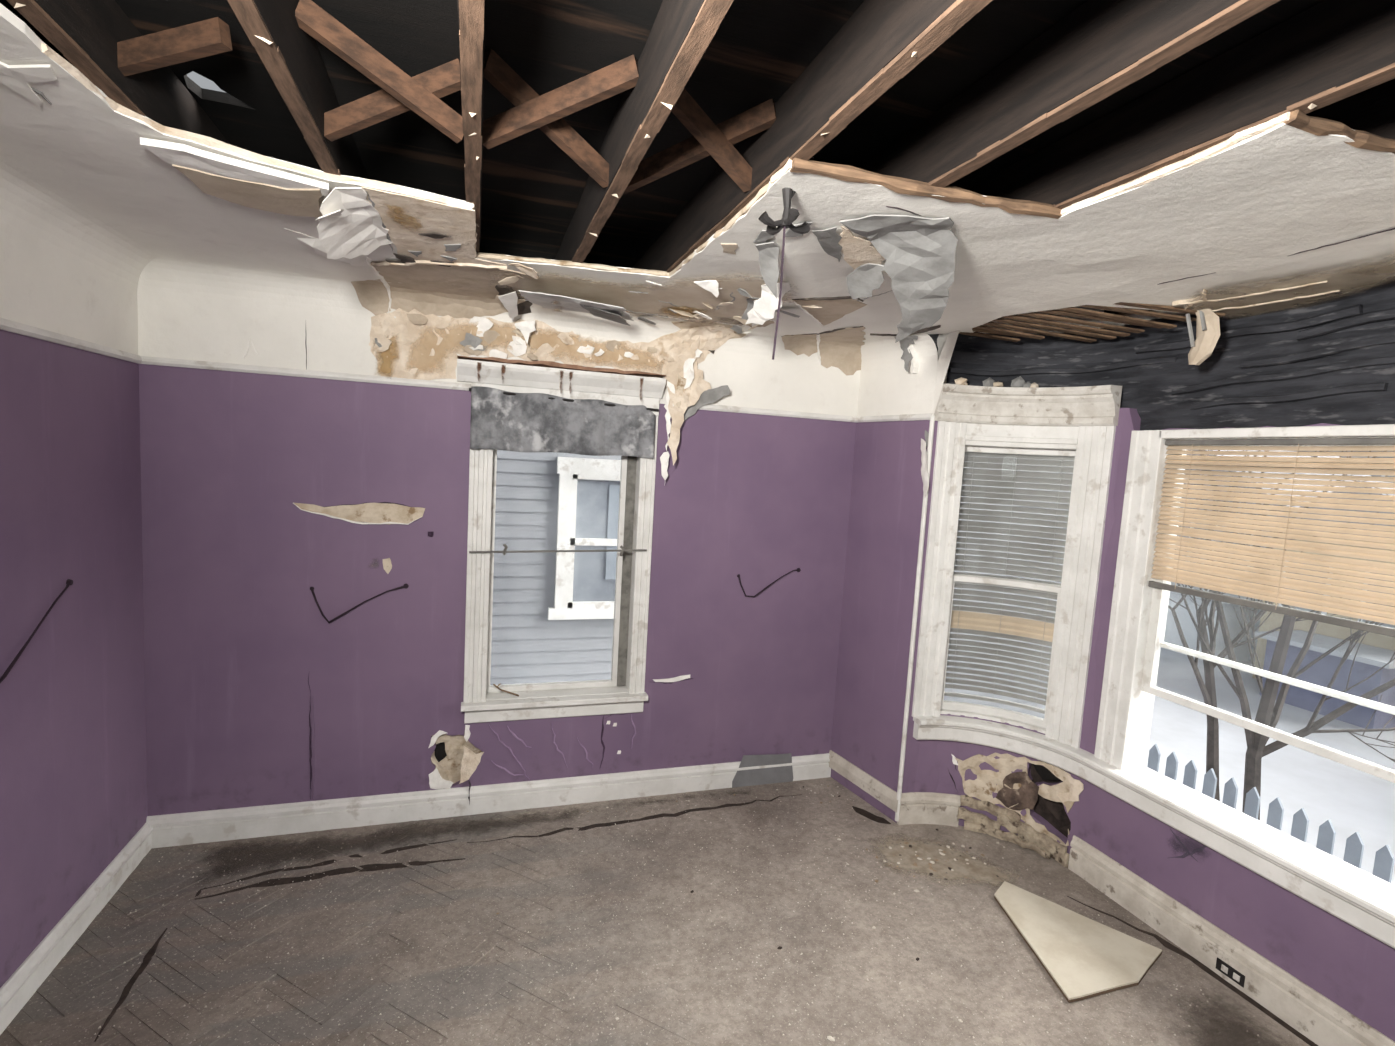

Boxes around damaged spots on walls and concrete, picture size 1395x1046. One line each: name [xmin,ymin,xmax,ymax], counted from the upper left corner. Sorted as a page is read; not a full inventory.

spalling [140,137,416,263]
spalling [369,290,737,380]
flaking render [721,206,1395,431]
damp [1172,277,1340,311]
peeling [921,430,929,499]
peeling [293,502,434,537]
peeling [383,558,392,574]
spalling [429,725,484,803]
spalling [948,752,1084,846]